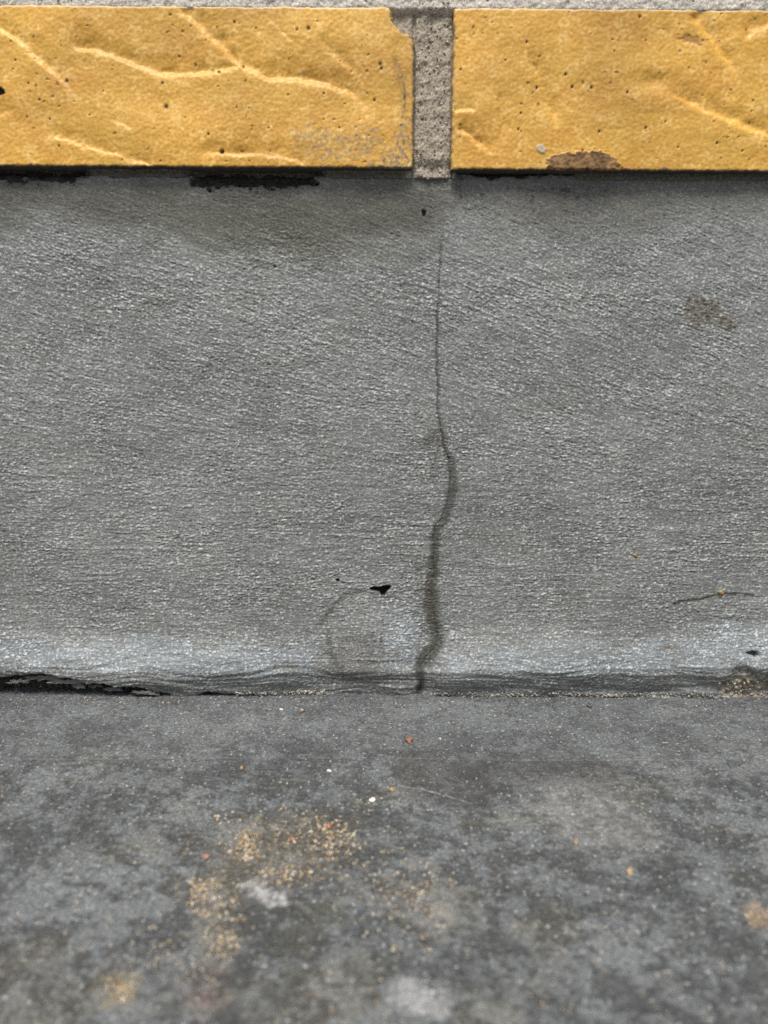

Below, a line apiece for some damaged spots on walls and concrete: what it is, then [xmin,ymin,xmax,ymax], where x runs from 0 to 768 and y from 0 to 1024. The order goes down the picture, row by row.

spalling [451,146,622,213]
crack [389,245,451,696]